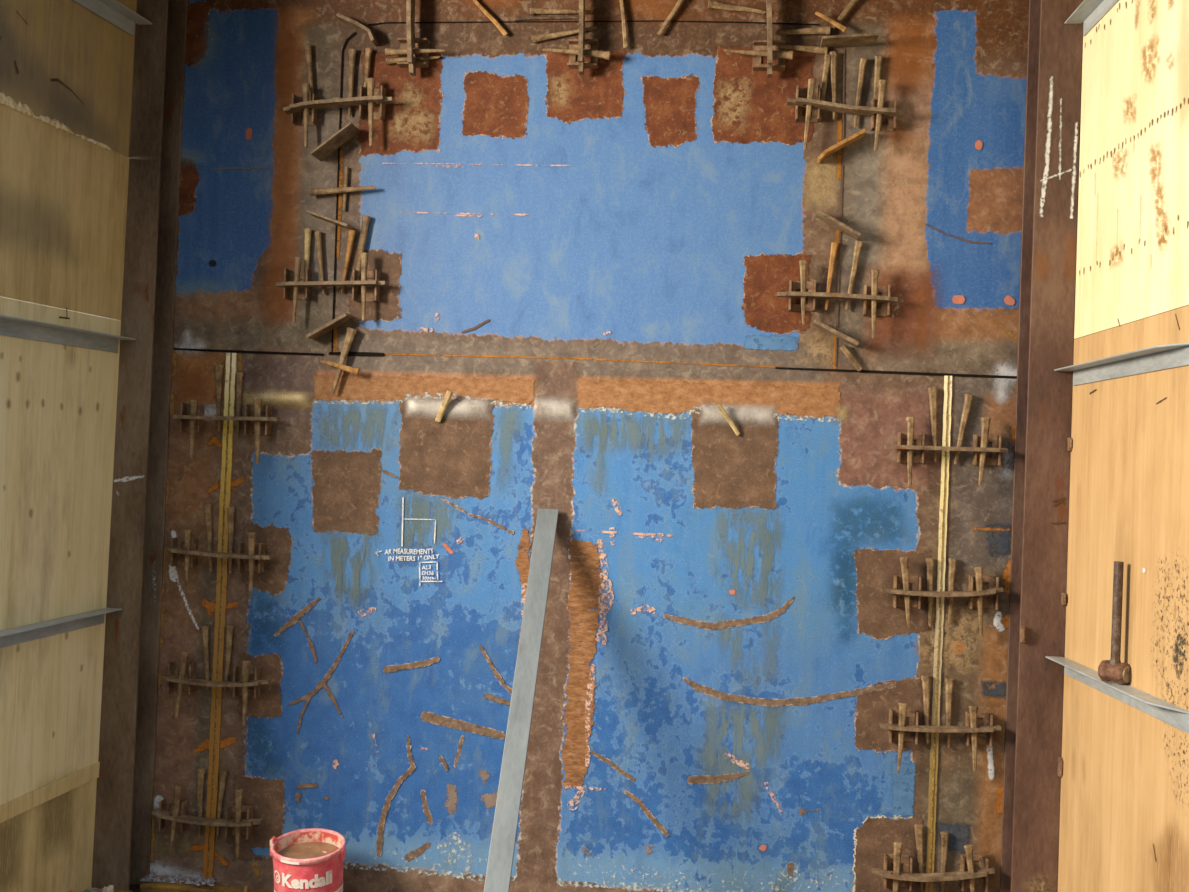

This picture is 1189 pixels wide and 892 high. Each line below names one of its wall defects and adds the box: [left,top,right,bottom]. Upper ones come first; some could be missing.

peeling [37,115,112,150]
water stain [1155,186,1167,245]
corrosion [560,527,615,790]
water stain [1152,564,1189,705]